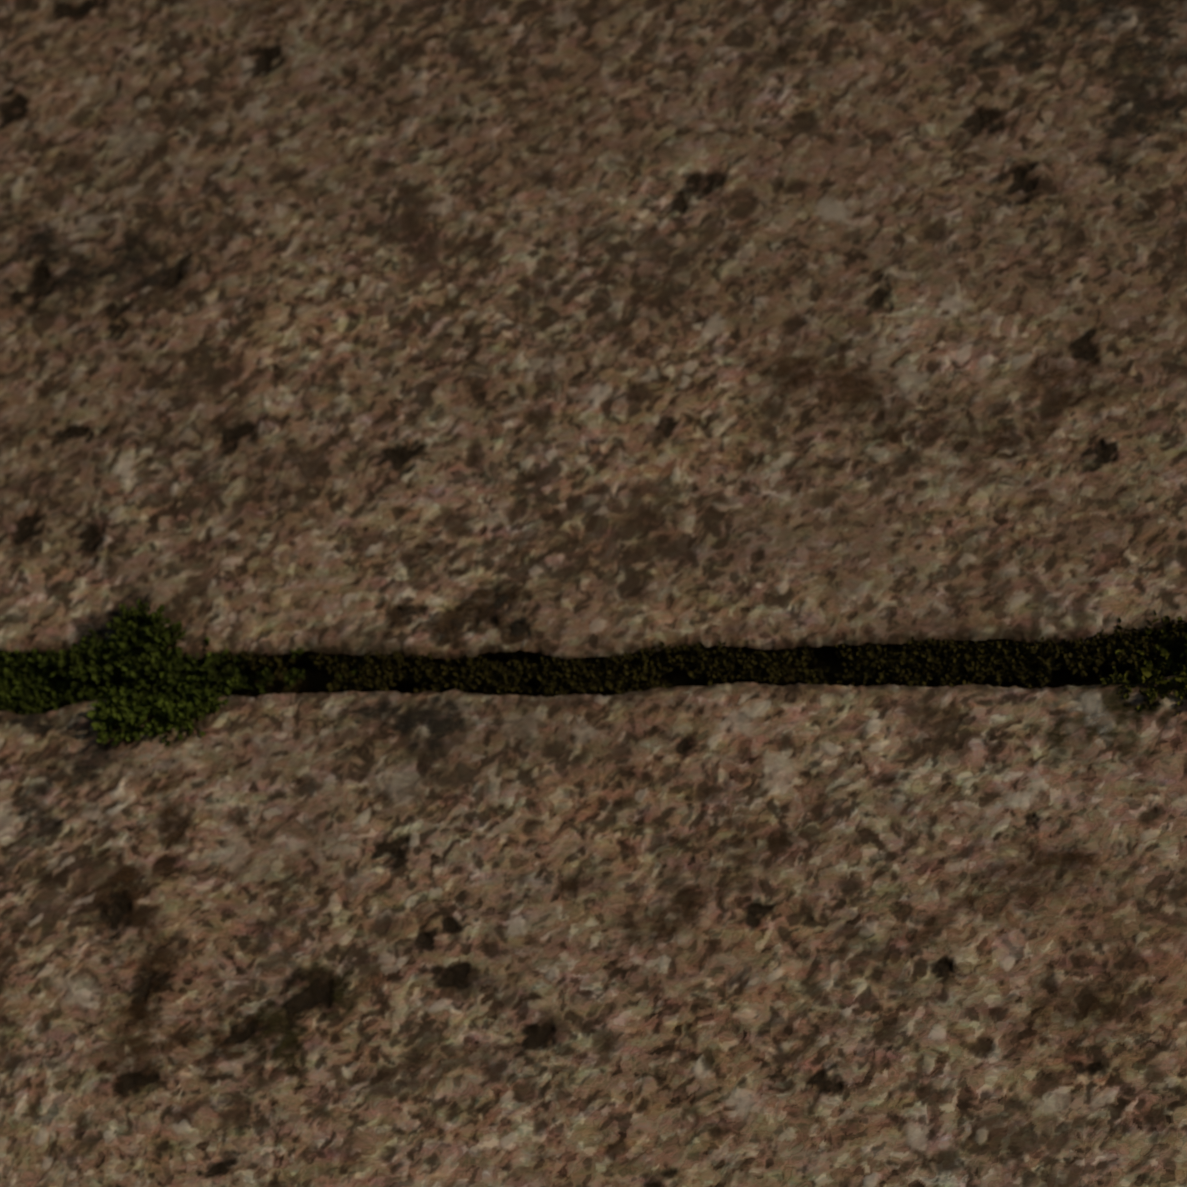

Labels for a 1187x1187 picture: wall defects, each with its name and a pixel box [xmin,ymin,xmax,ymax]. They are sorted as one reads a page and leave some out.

crack [0,619,1187,716]